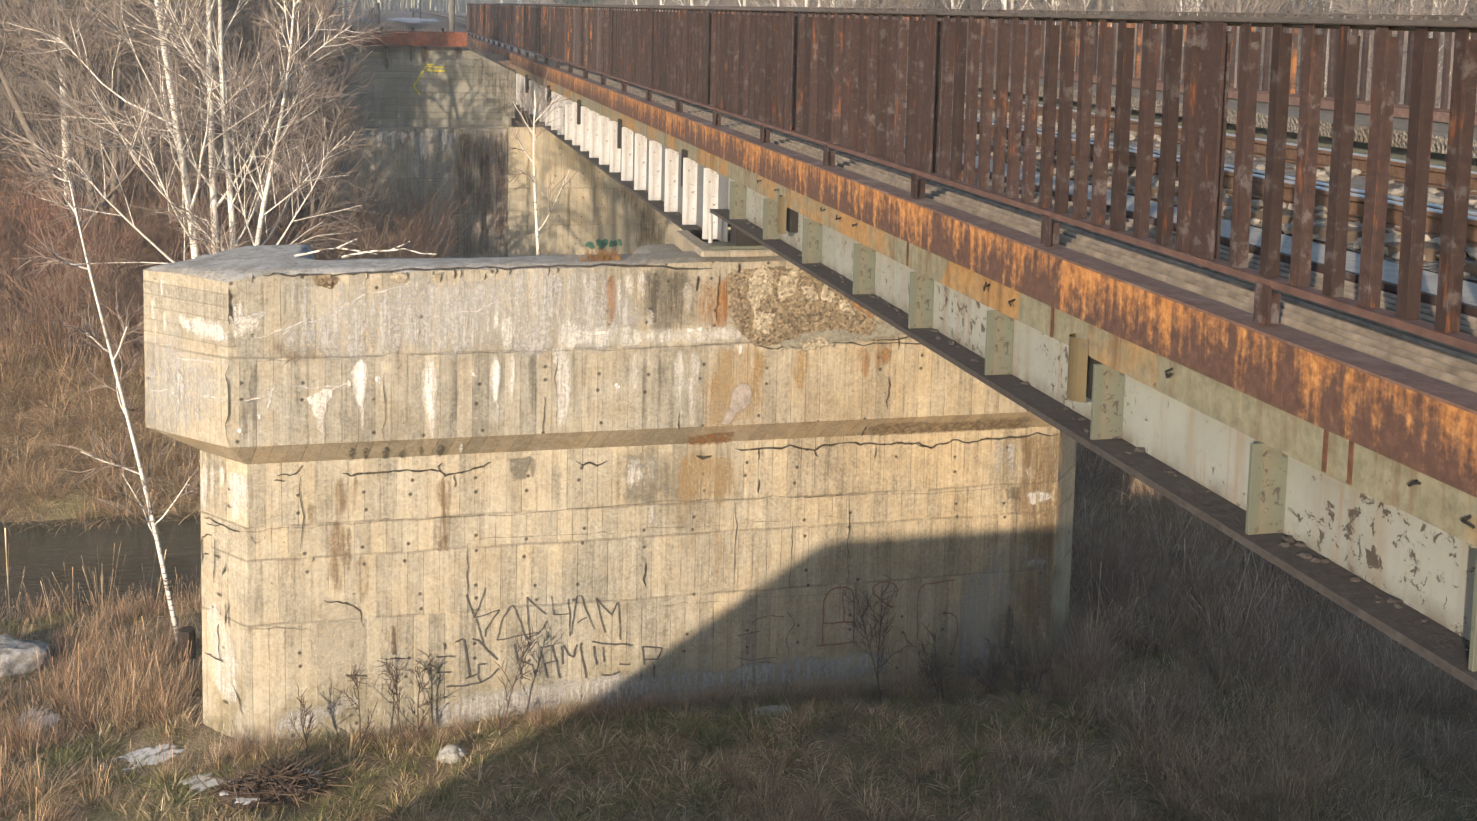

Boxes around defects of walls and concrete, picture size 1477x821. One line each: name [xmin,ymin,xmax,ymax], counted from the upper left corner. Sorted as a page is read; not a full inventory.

damp [287,271,762,425]
spalling [726,264,877,351]
crack [274,465,314,560]
crack [342,373,491,487]
crack [577,460,607,468]
crack [678,336,1057,582]